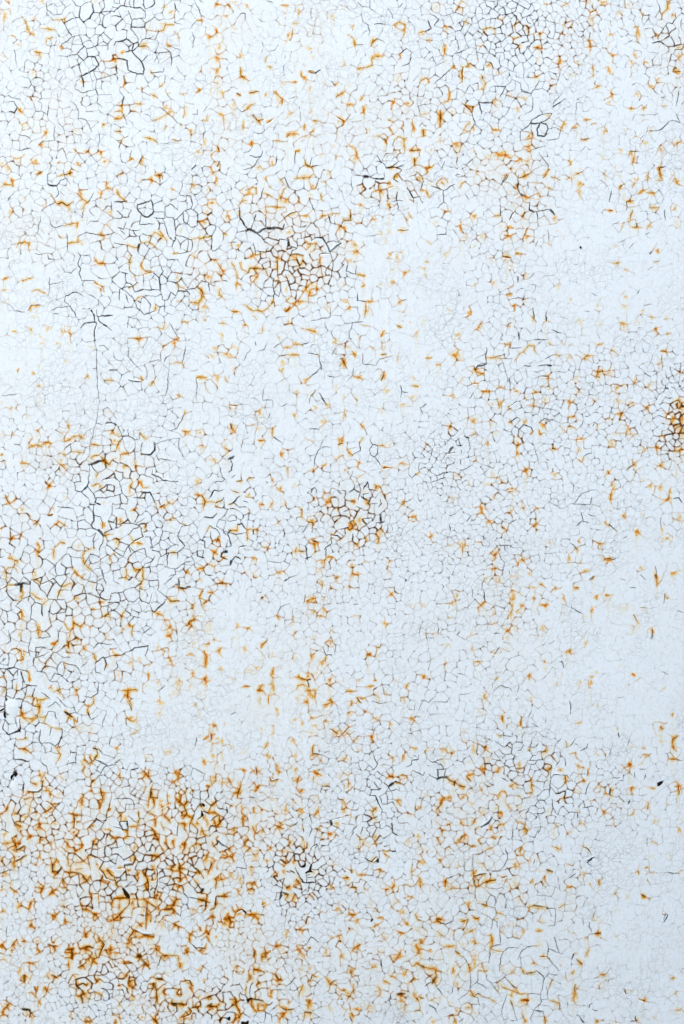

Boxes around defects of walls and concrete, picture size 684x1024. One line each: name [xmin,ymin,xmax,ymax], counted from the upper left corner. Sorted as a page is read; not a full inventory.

crack [4,0,684,480]
crack [0,405,648,1024]
crack [630,567,670,639]